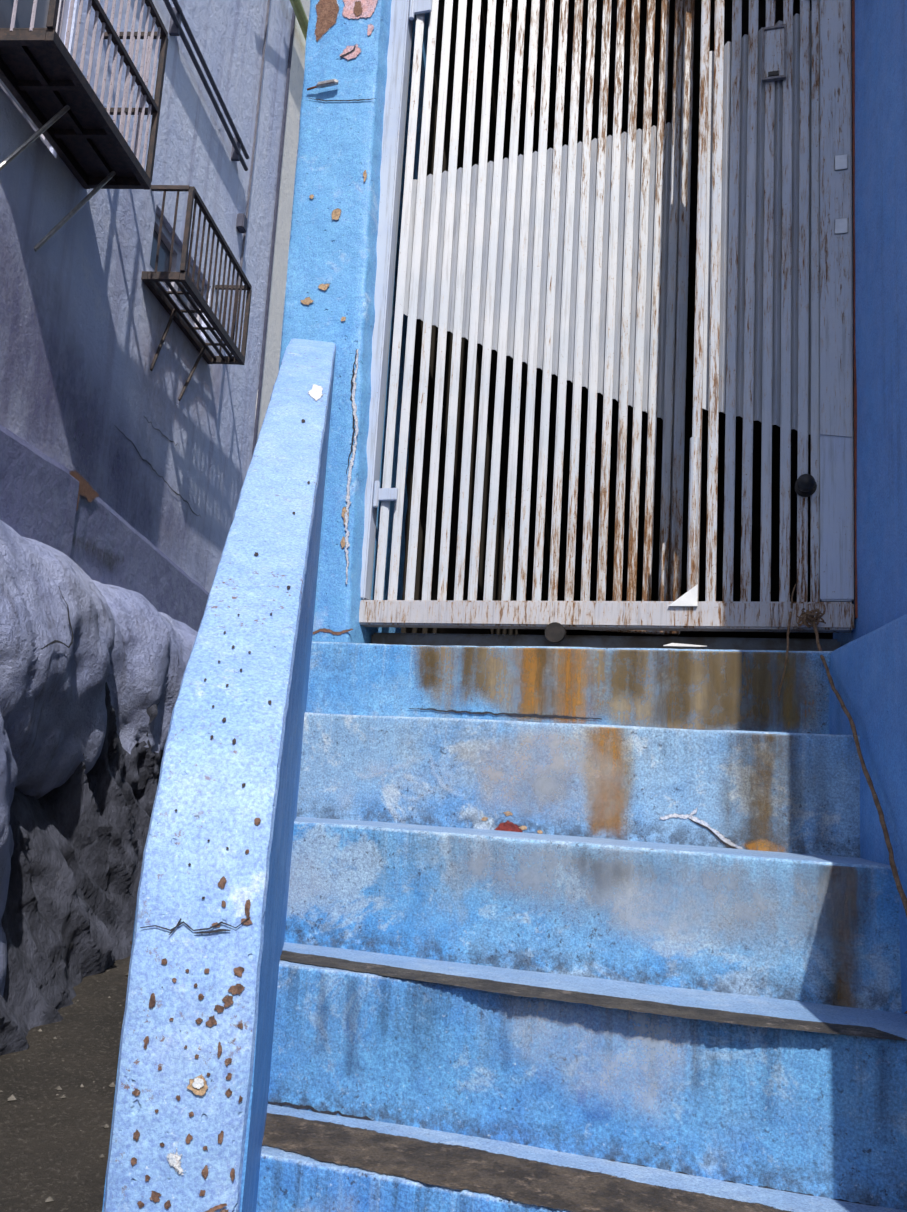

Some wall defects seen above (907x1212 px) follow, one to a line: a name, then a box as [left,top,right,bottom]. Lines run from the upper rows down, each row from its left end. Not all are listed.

peeling [314,0,378,60]
corrosion [420,646,816,852]
crack [140,917,250,935]
peeling [241,899,253,925]
peeling [172,966,245,1027]
peeling [176,1073,211,1101]
peeling [217,1042,243,1103]
peeling [131,1157,171,1209]
peeling [160,1131,224,1196]